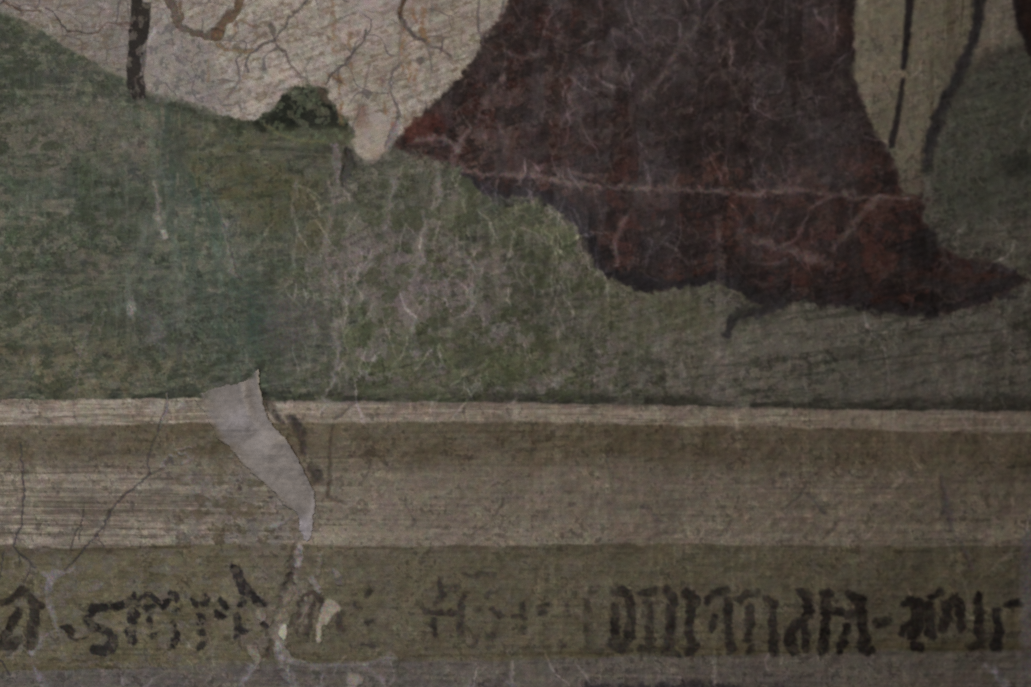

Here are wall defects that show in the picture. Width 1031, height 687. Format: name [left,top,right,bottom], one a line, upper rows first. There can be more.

crack [163,0,454,154]
crack [476,0,507,45]
crack [0,442,37,585]
crack [63,391,169,572]
peeling [194,369,346,672]